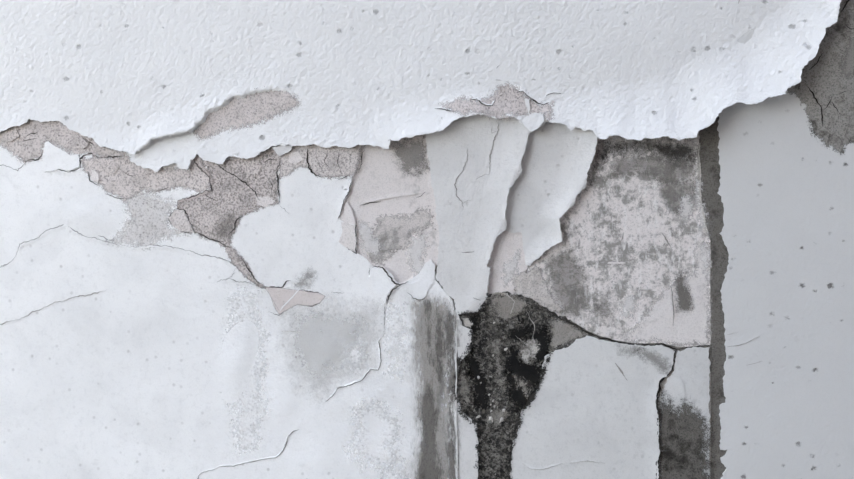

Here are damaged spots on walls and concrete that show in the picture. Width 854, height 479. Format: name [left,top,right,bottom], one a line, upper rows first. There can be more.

crack [0,290,106,327]
crack [0,158,338,316]
crack [197,430,297,479]
crack [306,149,423,401]
peeling [0,0,854,361]
peeling [457,387,479,479]
damp [344,291,594,479]
flaking render [510,131,714,479]
crack [540,305,761,479]
damp [671,272,693,323]